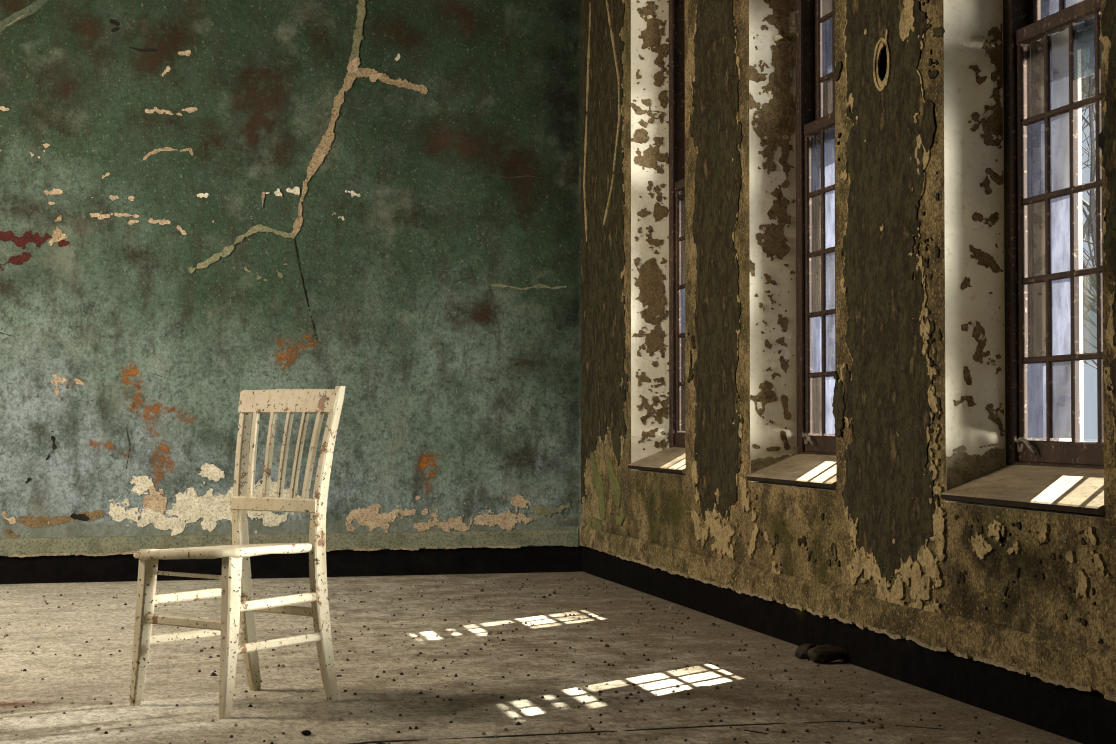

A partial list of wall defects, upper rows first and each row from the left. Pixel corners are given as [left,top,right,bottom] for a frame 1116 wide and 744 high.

peeling [143,147,193,160]
peeling [145,107,197,116]
crack [188,0,428,328]
peeling [0,188,70,271]
peeling [90,195,187,235]
peeling [345,0,669,533]
peeling [687,0,1005,614]
peeling [1098,0,1116,478]
rust [122,366,189,480]
peeling [2,463,233,539]
peeling [248,511,300,533]
peeling [968,517,1112,608]